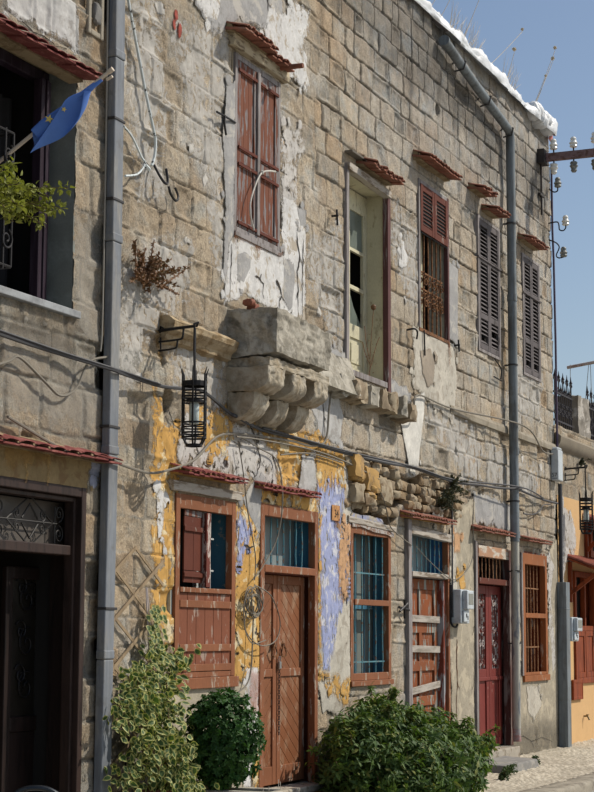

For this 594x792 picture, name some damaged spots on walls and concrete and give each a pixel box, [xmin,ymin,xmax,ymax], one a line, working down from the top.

peeling [124,0,345,352]
crack [255,236,304,316]
peeling [149,348,394,787]